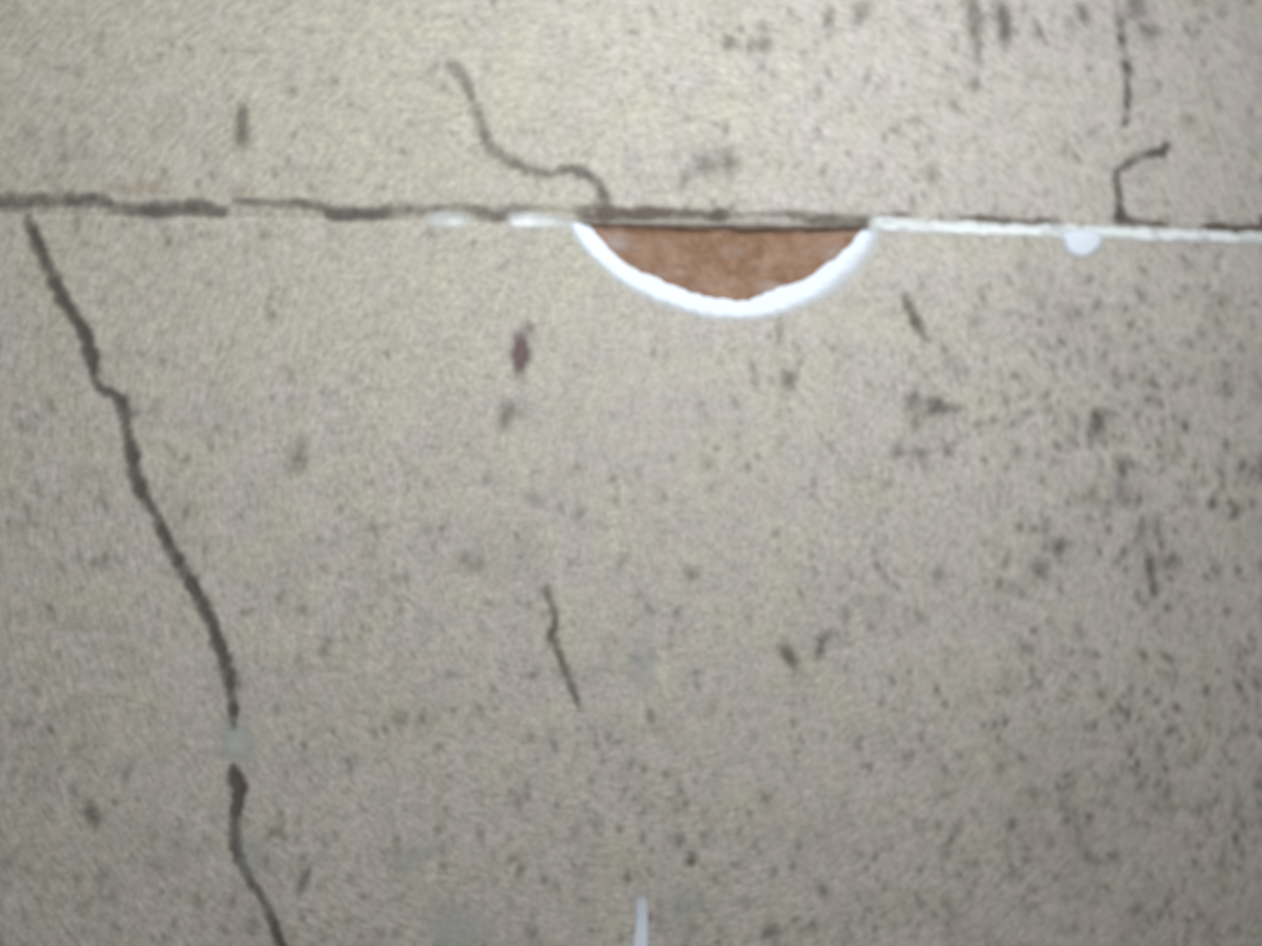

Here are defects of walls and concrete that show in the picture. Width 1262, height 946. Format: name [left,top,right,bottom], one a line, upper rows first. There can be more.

crack [1119,22,1131,126]
crack [518,165,607,198]
crack [1115,143,1169,217]
spalling [510,213,1262,318]
crack [27,223,238,719]
crack [229,765,285,946]